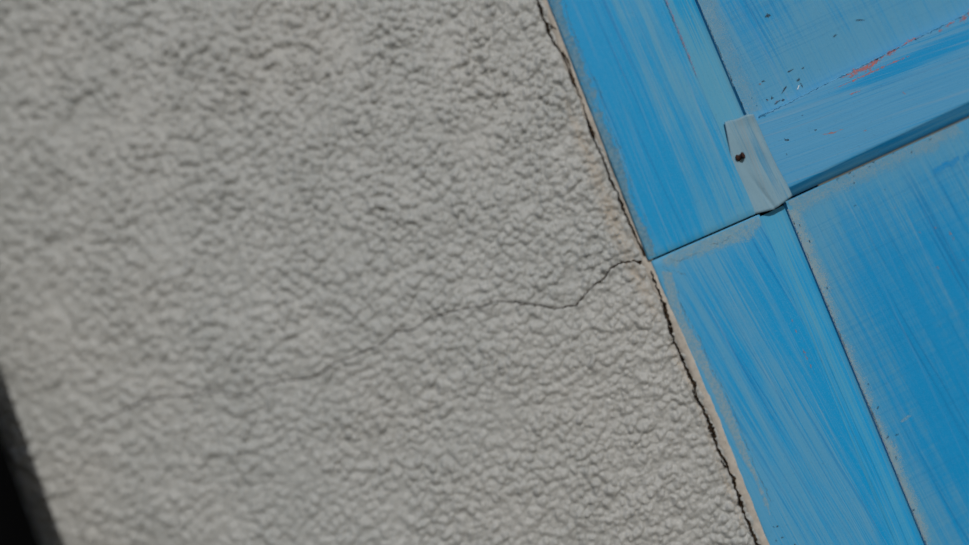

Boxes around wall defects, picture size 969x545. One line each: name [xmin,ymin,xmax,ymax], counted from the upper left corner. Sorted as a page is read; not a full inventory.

crack [41,0,760,545]